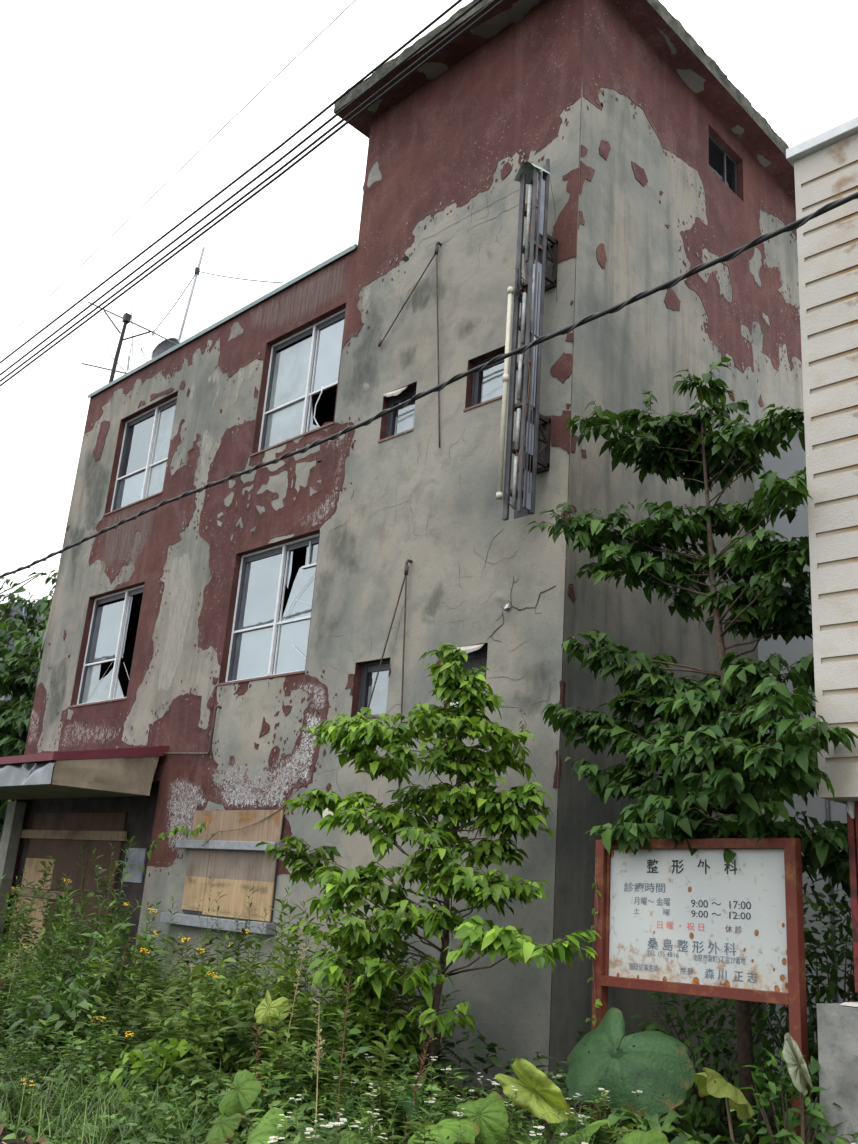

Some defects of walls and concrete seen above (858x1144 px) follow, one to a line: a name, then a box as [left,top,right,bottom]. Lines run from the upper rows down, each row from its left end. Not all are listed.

peeling [363,155,385,194]
peeling [697,239,736,305]
peeling [746,201,800,323]
peeling [709,471,754,519]
peeling [644,524,753,573]
crack [441,532,556,651]
water stain [214,683,325,807]
peeling [456,735,492,752]
water stain [167,779,205,848]
peeling [458,816,501,847]
peeling [133,726,476,1022]
peeling [608,987,738,1081]